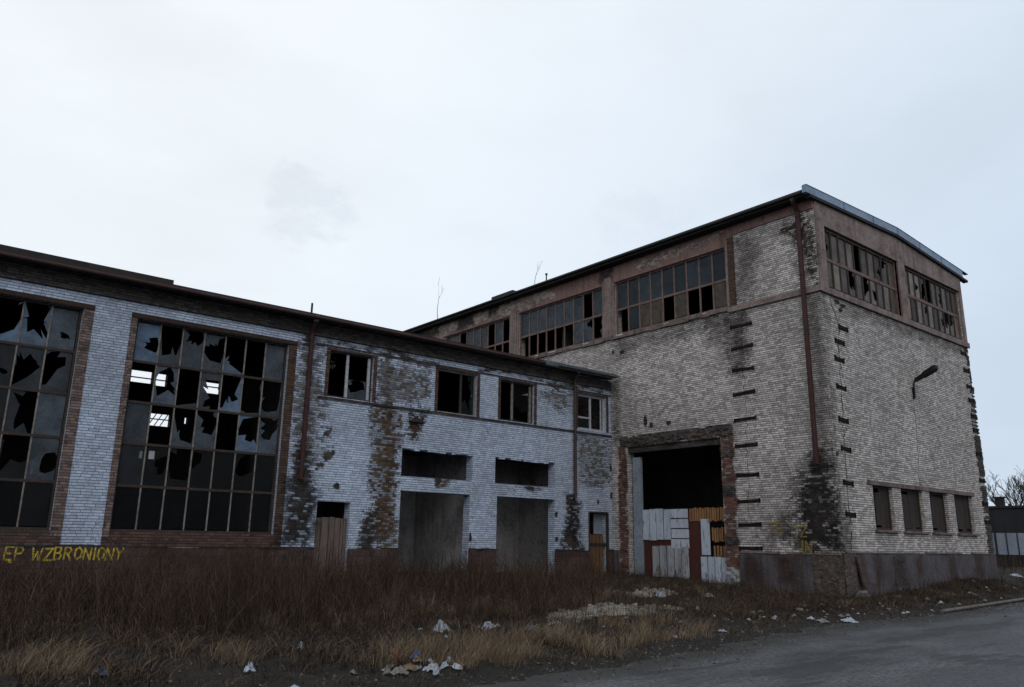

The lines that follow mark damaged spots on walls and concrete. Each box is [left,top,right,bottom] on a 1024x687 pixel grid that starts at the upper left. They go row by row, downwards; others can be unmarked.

peeling [289,332,440,489]
water stain [782,448,845,554]